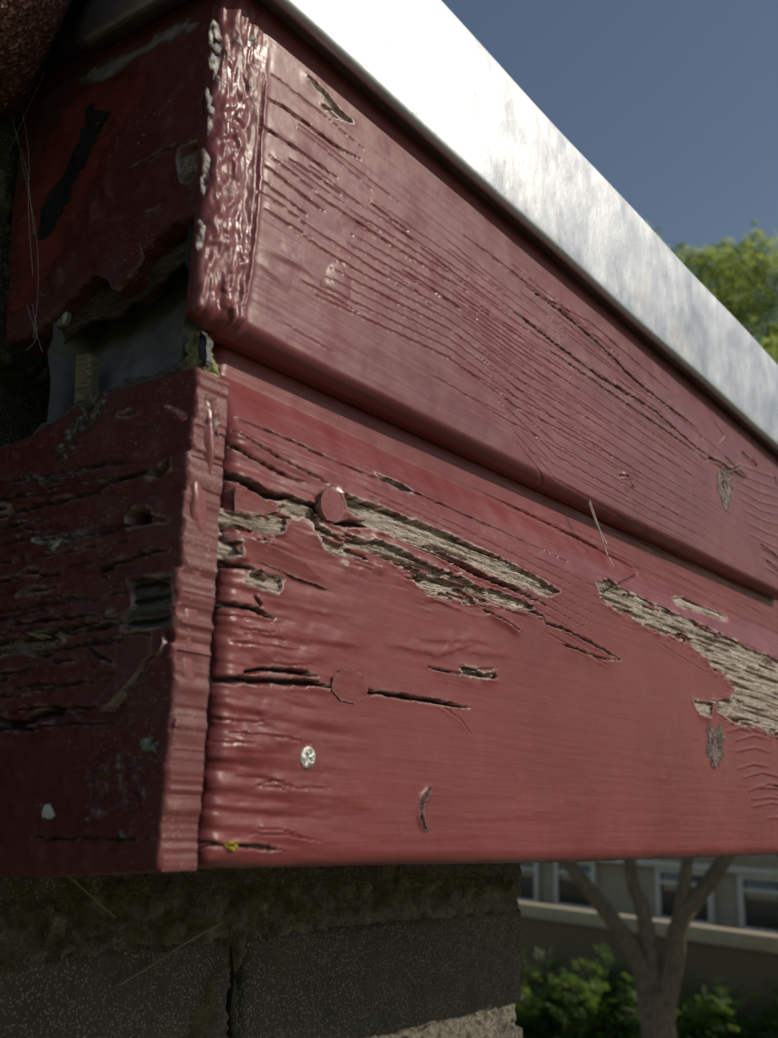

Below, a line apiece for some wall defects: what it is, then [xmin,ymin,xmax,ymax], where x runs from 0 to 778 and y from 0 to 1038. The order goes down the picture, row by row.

peeling [201,152,210,193]
peeling [197,220,206,249]
crack [222,420,508,535]
peeling [217,487,555,612]
peeling [95,578,172,712]
crack [208,668,324,688]
crack [367,692,465,708]
crack [427,667,491,677]
peeling [460,668,494,679]
crack [445,560,619,660]
peeling [597,576,778,735]
crack [226,947,234,1038]